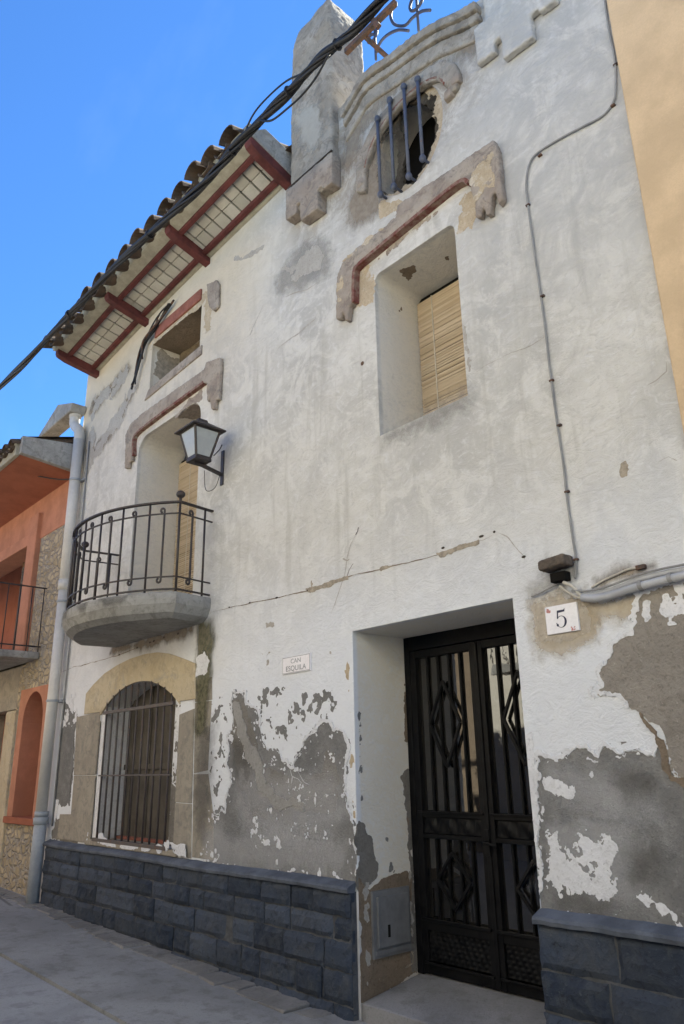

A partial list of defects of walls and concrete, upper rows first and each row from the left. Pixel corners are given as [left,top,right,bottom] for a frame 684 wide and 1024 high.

peeling [456,151,495,234]
peeling [356,211,438,307]
crack [213,527,526,612]
leakage [110,622,214,736]
peeling [51,692,78,843]
peeling [95,717,103,809]
peeling [200,687,395,923]
peeling [525,580,684,927]
flaking render [400,769,418,973]